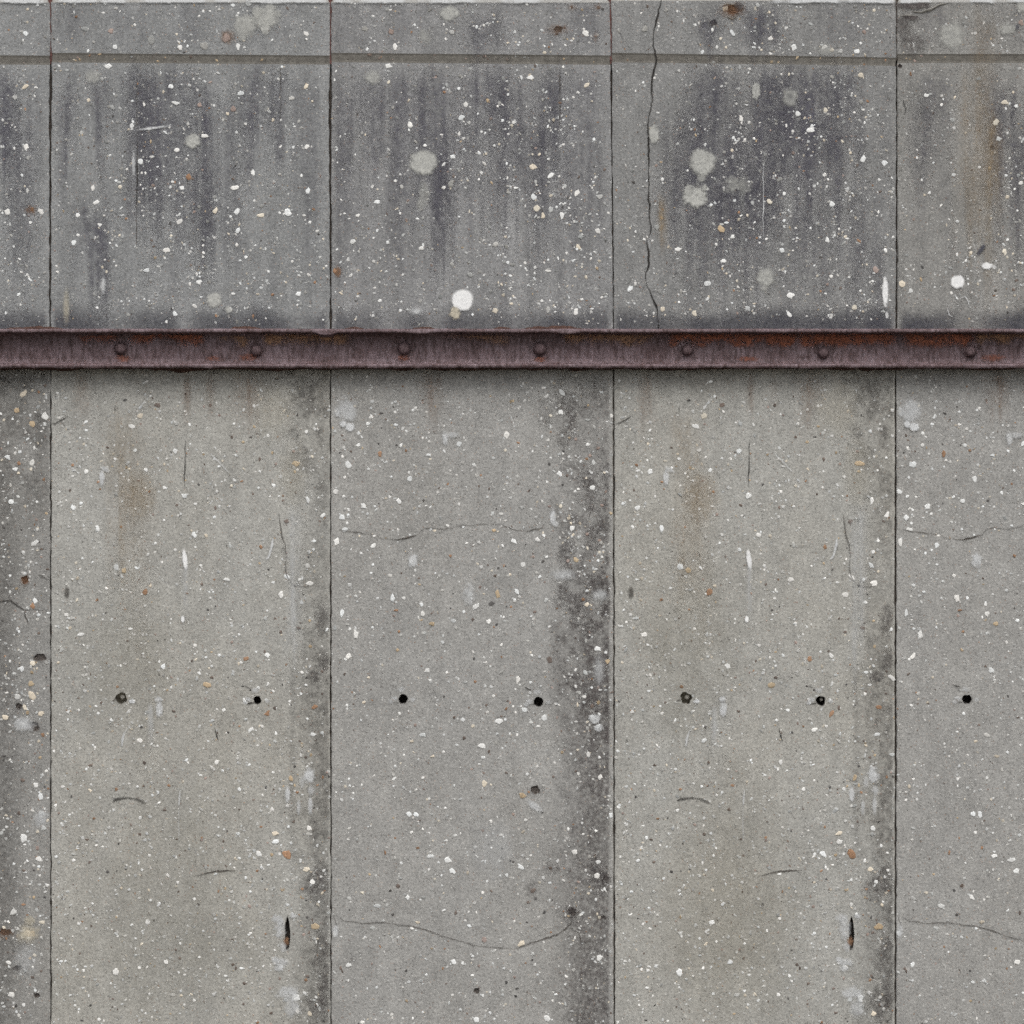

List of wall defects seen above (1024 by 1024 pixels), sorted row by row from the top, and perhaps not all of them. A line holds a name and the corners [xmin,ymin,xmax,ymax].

water stain [132,88,170,198]
crack [645,0,662,328]
water stain [781,81,816,179]
rust [100,334,1024,373]
water stain [692,314,890,329]
water stain [557,558,610,1024]
crack [495,920,587,948]